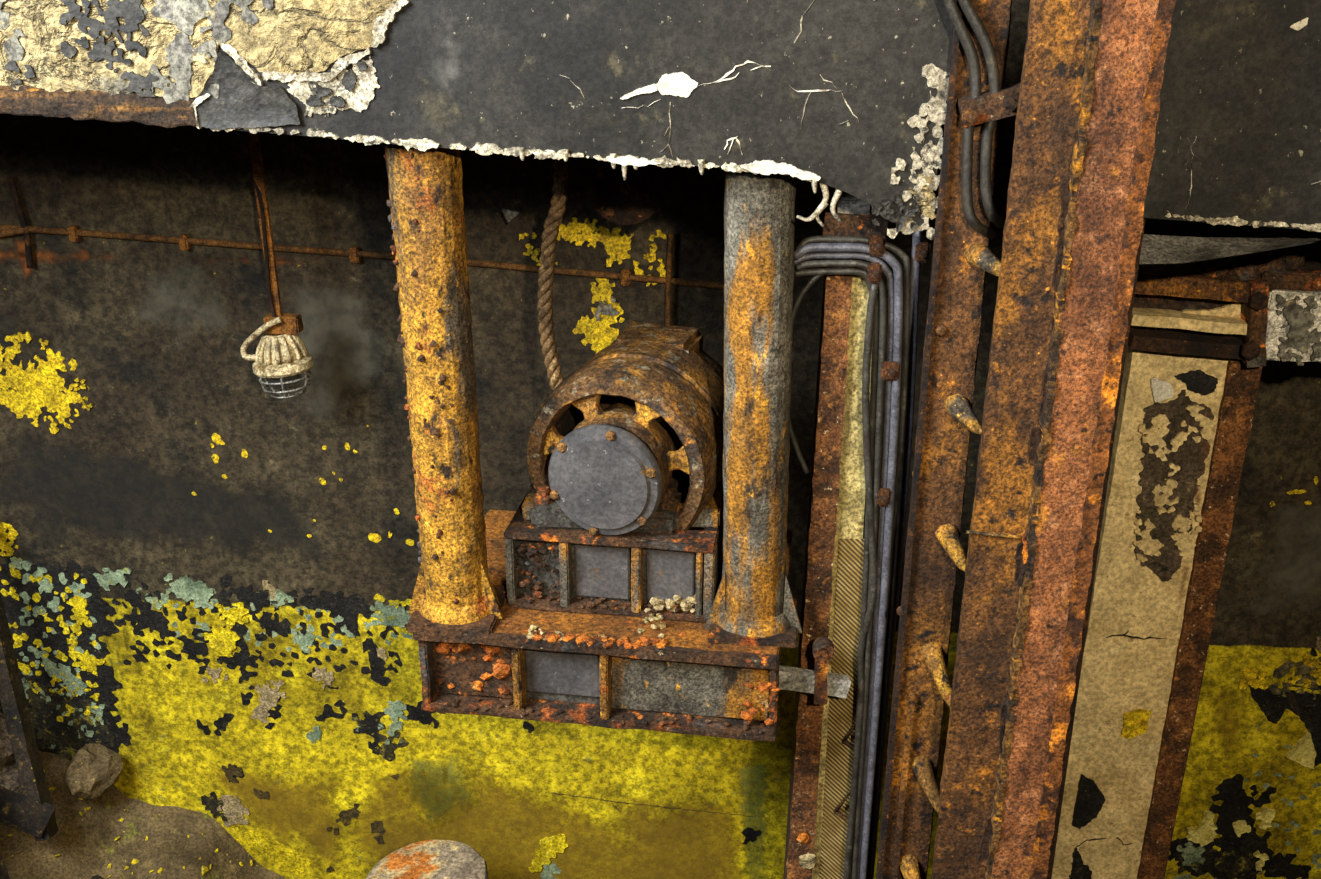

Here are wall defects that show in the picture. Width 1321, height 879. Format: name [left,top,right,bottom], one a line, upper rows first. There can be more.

flaking render [0,0,410,130]
crack [622,99,672,154]
crack [724,136,743,155]
crack [698,60,859,125]
spalling [871,63,950,240]
corrosion [387,200,418,292]
corrosion [397,315,454,438]
peeling [1133,370,1218,582]
corrosion [415,509,444,564]
peeling [1168,628,1321,879]
damp [221,777,335,859]
damp [355,772,735,879]